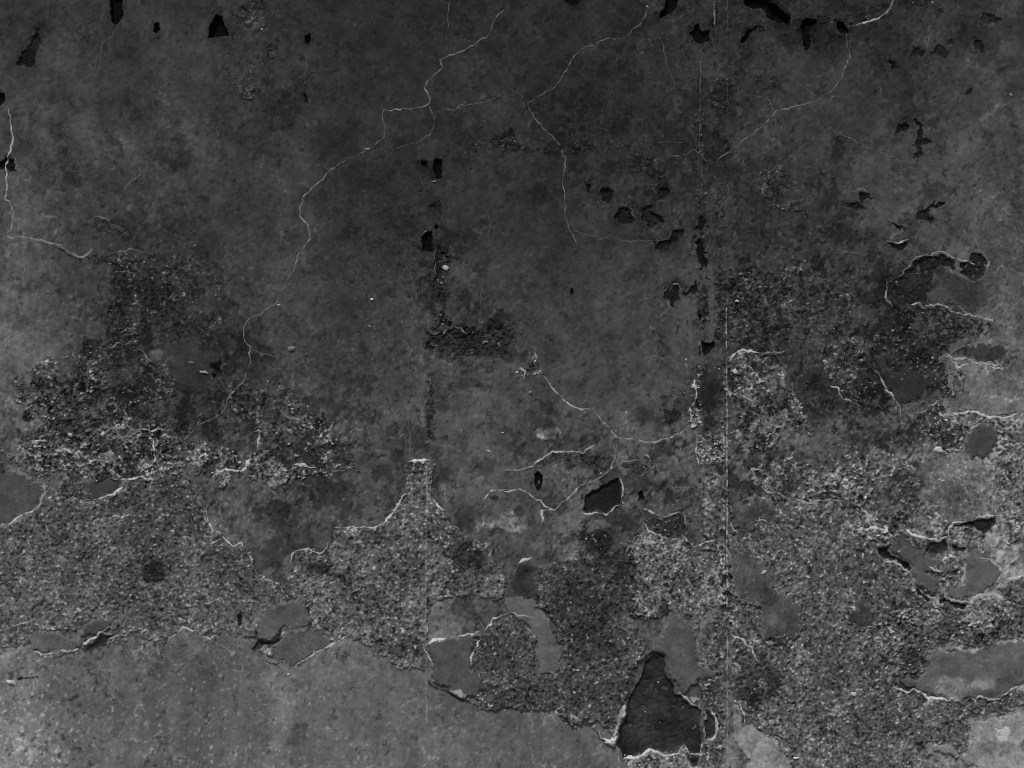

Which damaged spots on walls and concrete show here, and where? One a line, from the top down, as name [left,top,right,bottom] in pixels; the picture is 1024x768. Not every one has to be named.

crack [2,108,93,260]
spalling [99,288,179,407]
spalling [0,350,508,672]
crack [184,0,695,468]
crack [483,486,580,522]
spalling [422,110,1024,768]
crack [638,1,963,253]